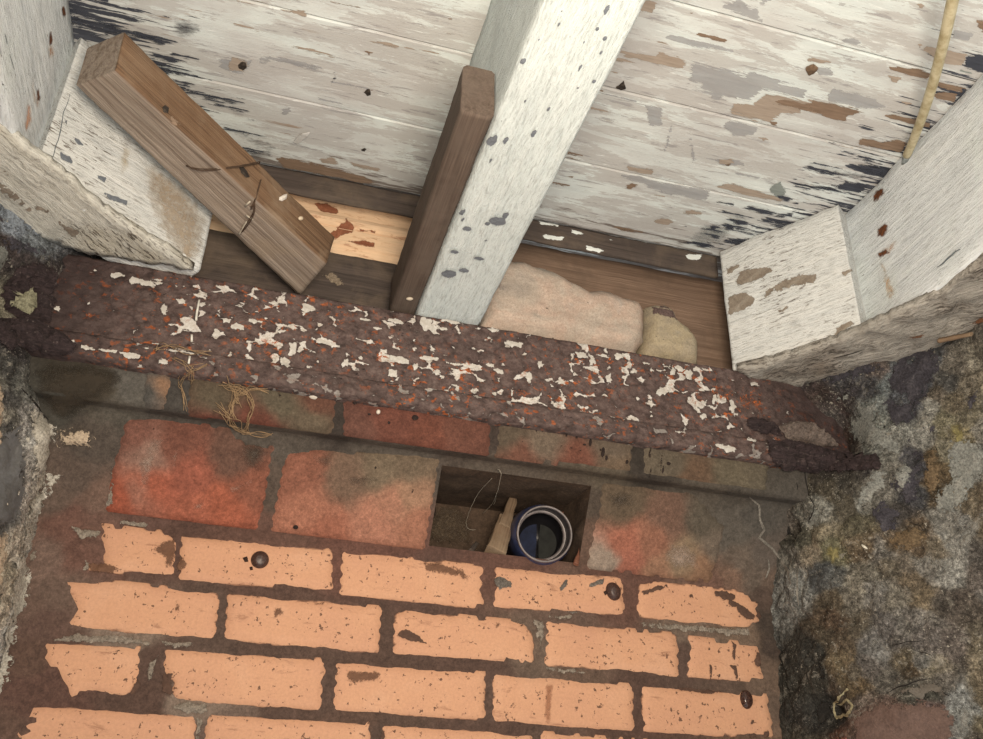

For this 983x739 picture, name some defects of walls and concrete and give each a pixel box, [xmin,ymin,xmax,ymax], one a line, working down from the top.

peeling [918,44,983,74]
peeling [610,50,930,141]
peeling [888,66,966,103]
peeling [859,139,907,152]
peeling [275,156,380,184]
peeling [621,158,786,227]
peeling [539,221,583,240]
peeling [110,272,162,286]
peeling [727,264,816,315]
peeling [212,318,263,338]
peeling [72,340,149,368]
peeling [388,355,503,377]